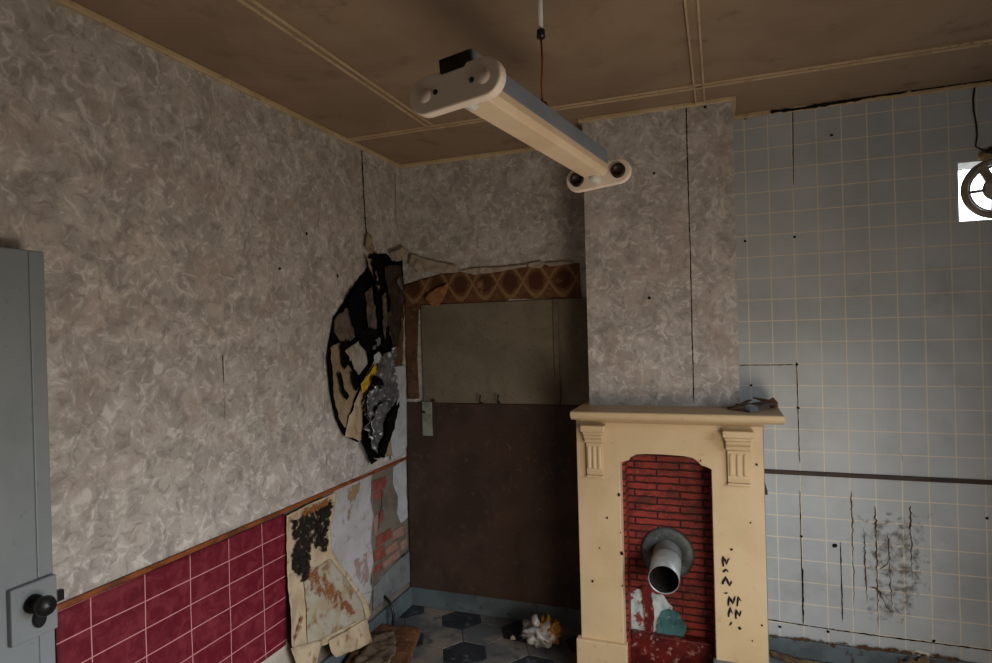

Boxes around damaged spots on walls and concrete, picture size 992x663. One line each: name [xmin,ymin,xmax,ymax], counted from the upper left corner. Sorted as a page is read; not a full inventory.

flaking render [371,460,411,611]
water stain [850,493,916,628]
flaking render [261,639,296,663]